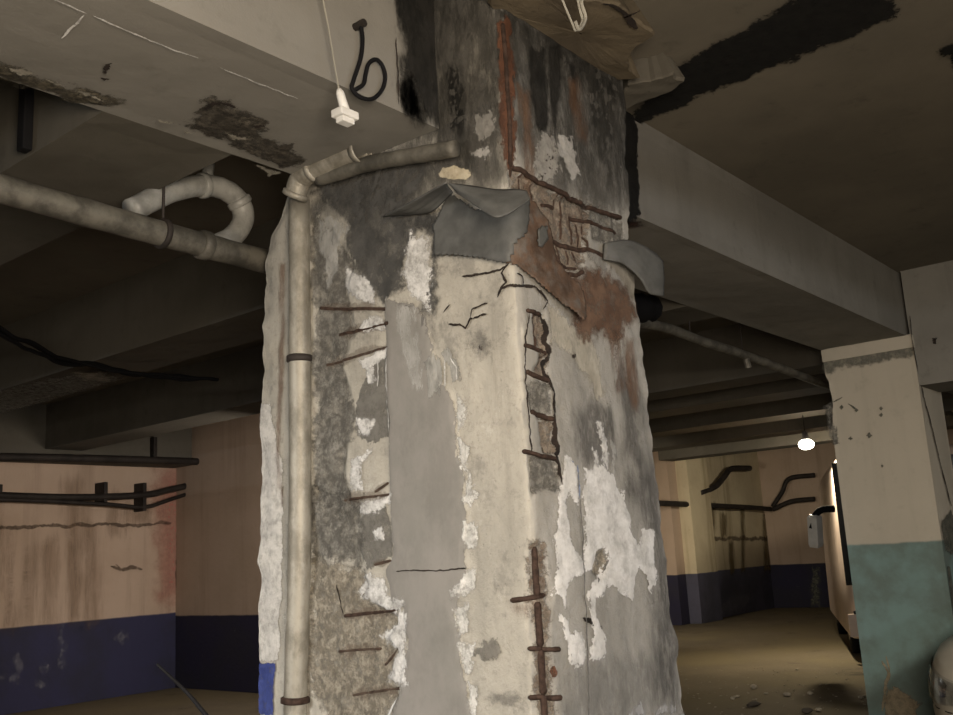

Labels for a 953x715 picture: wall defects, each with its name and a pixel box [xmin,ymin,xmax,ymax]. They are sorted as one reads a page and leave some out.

damp [399,78,423,122]
damp [446,67,464,135]
crack [444,263,548,329]
corrosion [570,269,637,386]
spalling [307,213,400,715]
crack [0,521,171,530]
peeling [510,308,659,715]
crack [945,566,953,604]